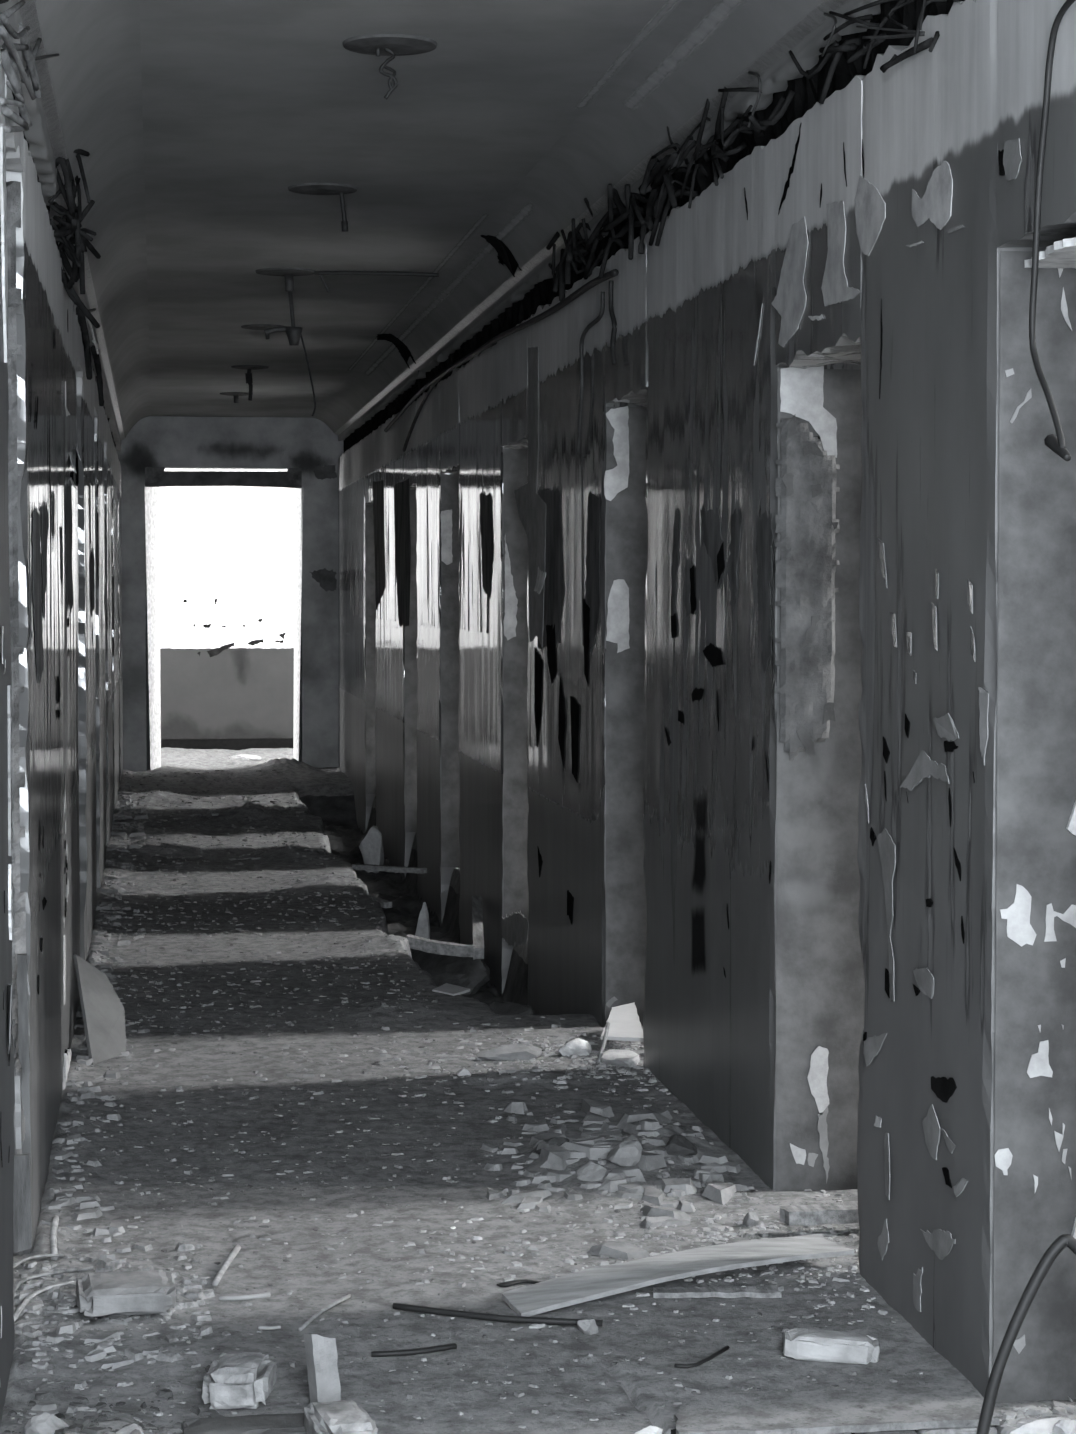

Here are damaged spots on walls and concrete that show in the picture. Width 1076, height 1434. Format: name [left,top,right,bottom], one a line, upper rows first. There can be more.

flaking render [1025,237,1076,330]
flaking render [0,124,95,1155]
peeling [372,479,411,627]
peeling [479,346,580,783]
peeling [583,406,630,686]
peeling [670,508,697,638]
flaking render [700,366,840,761]
flaking render [1000,884,1076,947]
flaking render [790,1046,830,1183]
peeling [922,1076,968,1197]
flaking render [994,1148,1013,1175]
flaking render [1027,1025,1053,1078]